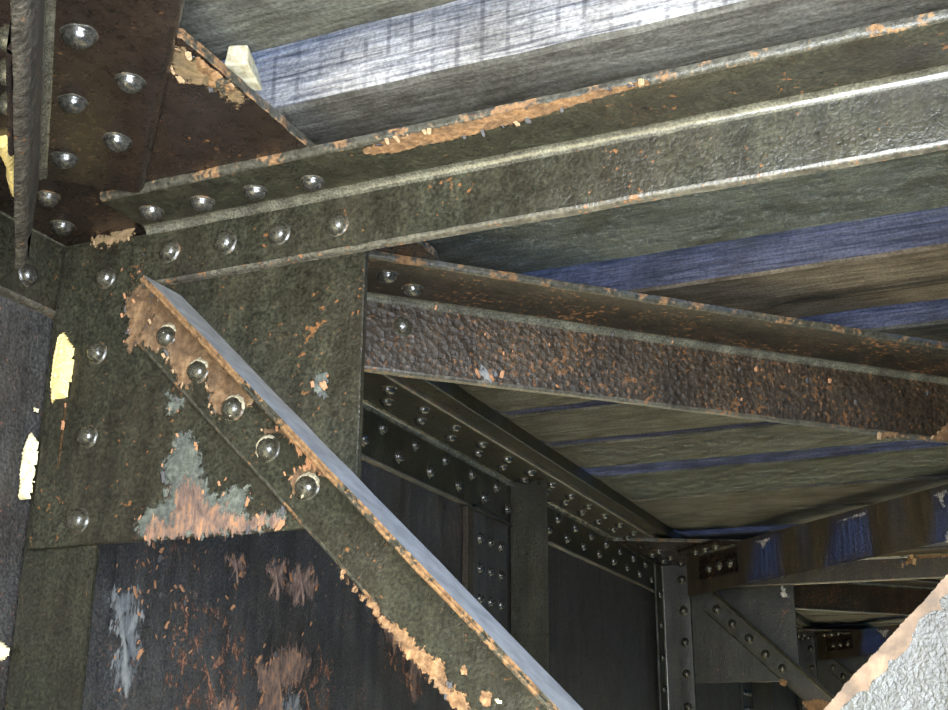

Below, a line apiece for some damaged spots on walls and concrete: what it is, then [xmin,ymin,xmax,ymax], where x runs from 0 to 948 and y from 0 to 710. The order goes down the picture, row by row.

peeling [120,248,253,422]
corrosion [877,423,948,442]
peeling [104,425,326,699]
corrosion [214,684,238,710]
corrosion [251,640,312,710]
corrosion [376,611,422,708]
peeling [336,567,493,710]
peeling [800,575,948,710]